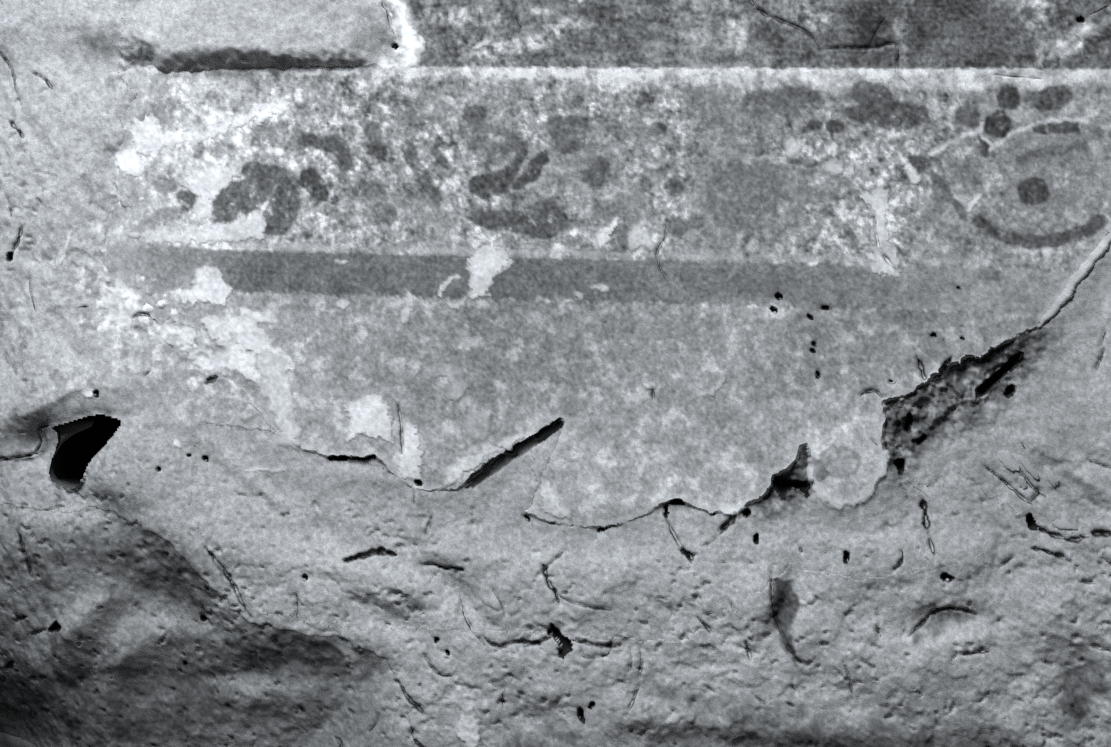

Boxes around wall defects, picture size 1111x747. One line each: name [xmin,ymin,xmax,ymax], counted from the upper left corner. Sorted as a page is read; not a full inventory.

peeling [113,99,294,177]
peeling [784,138,800,156]
peeling [826,159,844,175]
peeling [899,153,920,184]
peeling [129,164,267,245]
peeling [967,193,982,212]
peeling [597,217,655,250]
peeling [860,187,903,278]
crack [916,356,951,379]
crack [468,419,562,483]
flaking render [0,231,1111,747]